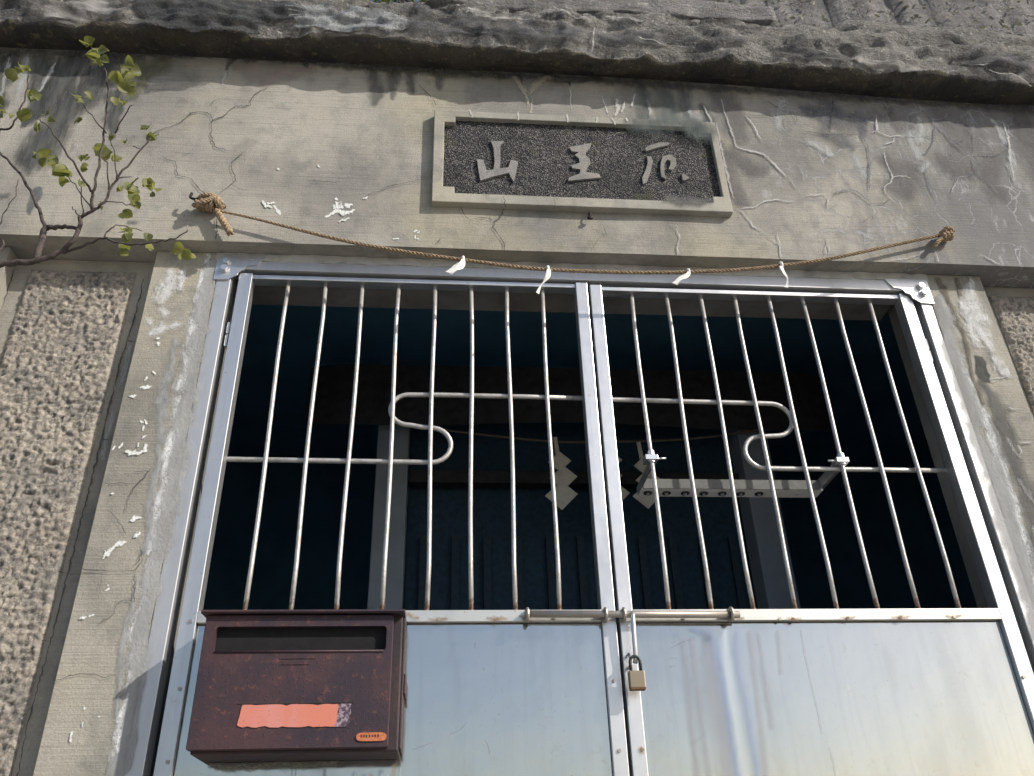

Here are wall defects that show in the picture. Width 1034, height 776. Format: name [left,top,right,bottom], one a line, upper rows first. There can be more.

water stain [27,186,42,214]
water stain [0,48,193,171]
crack [143,88,266,193]
peeling [325,196,368,222]
crack [461,197,506,251]
water stain [222,57,1034,205]
crack [704,100,1022,257]
peeling [112,419,148,456]
water stain [936,279,1034,638]
peeling [102,515,141,559]